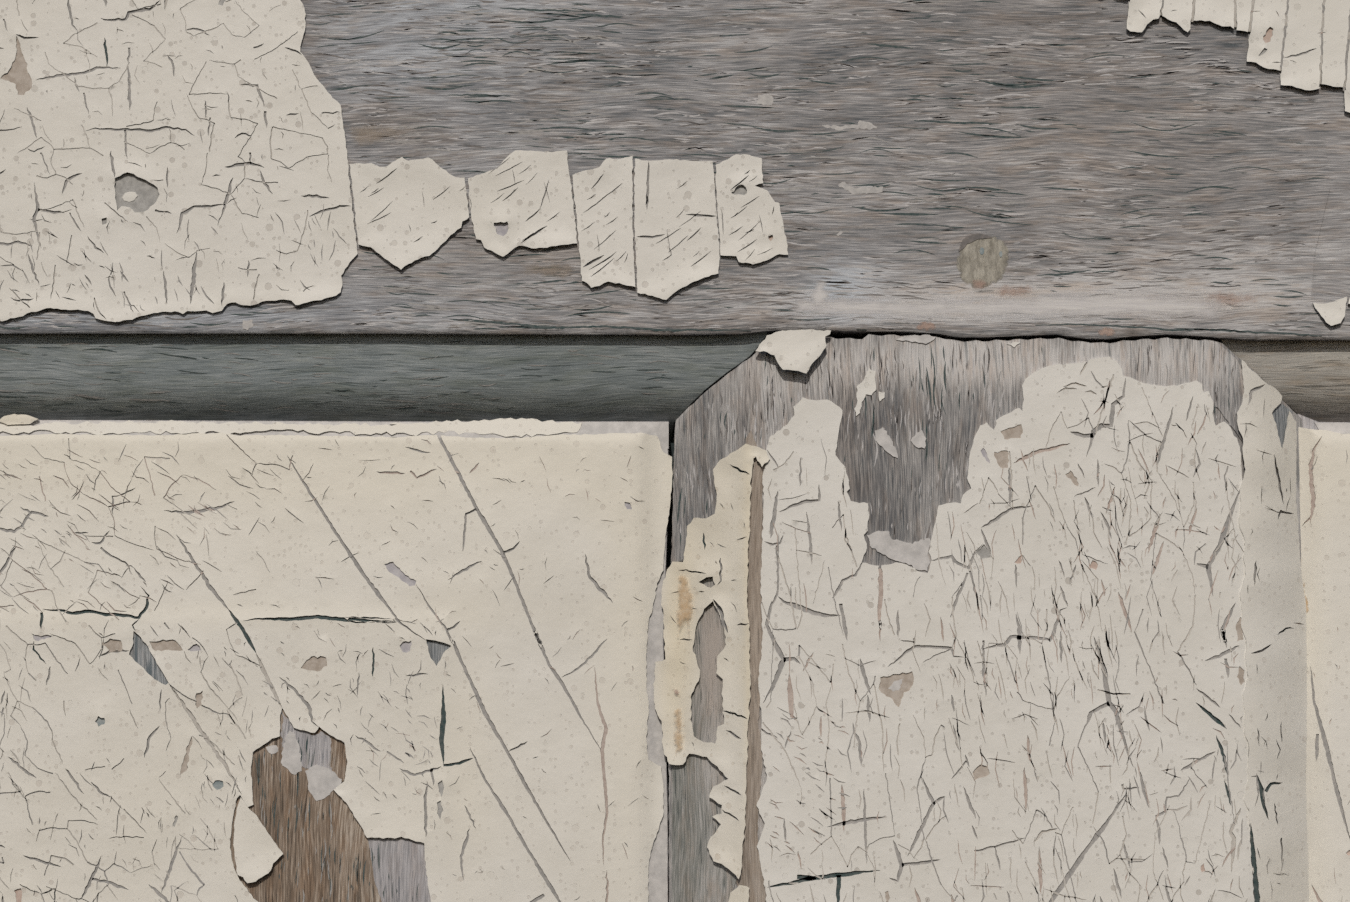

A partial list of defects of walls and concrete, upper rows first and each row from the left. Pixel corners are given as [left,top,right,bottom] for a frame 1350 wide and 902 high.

crack [870,42,911,50]
crack [914,106,1042,125]
peeling [0,0,1350,573]
crack [1037,269,1089,277]
crack [0,363,1350,902]
peeling [646,457,767,902]
peeling [879,672,914,707]
peeling [972,764,990,781]
peeling [230,708,431,902]